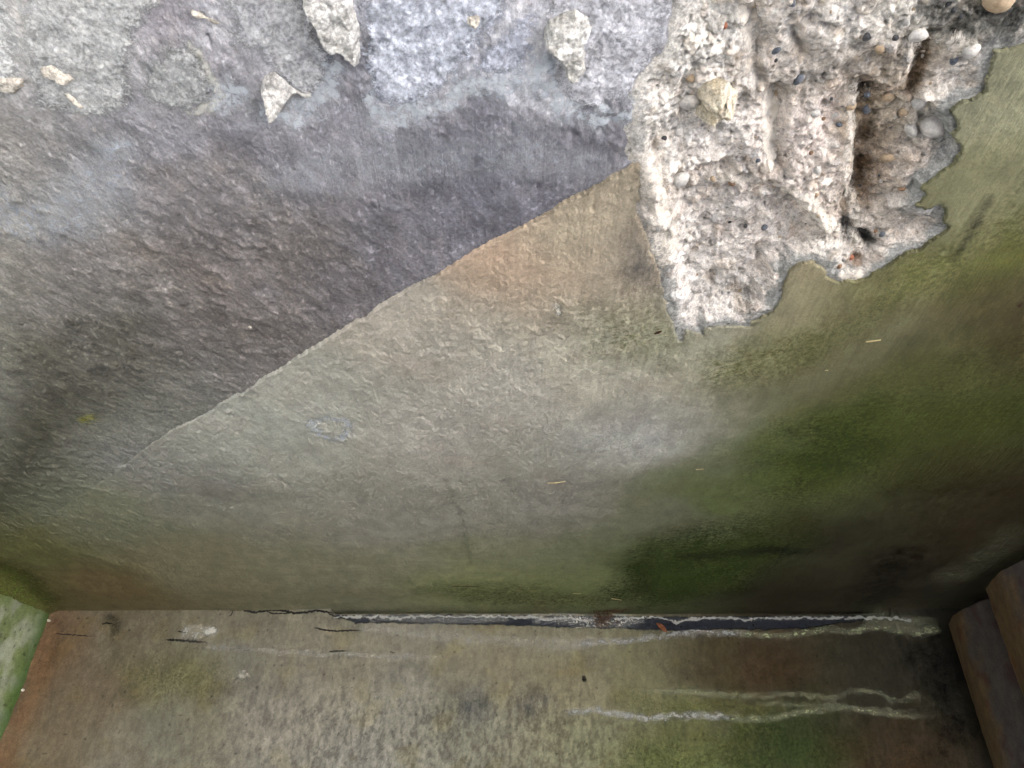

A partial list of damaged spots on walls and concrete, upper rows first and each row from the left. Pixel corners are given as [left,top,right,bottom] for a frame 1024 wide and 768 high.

peeling [0,0,1024,541]
water stain [583,625,827,646]
water stain [842,615,965,730]
water stain [569,707,759,722]
water stain [768,693,916,718]